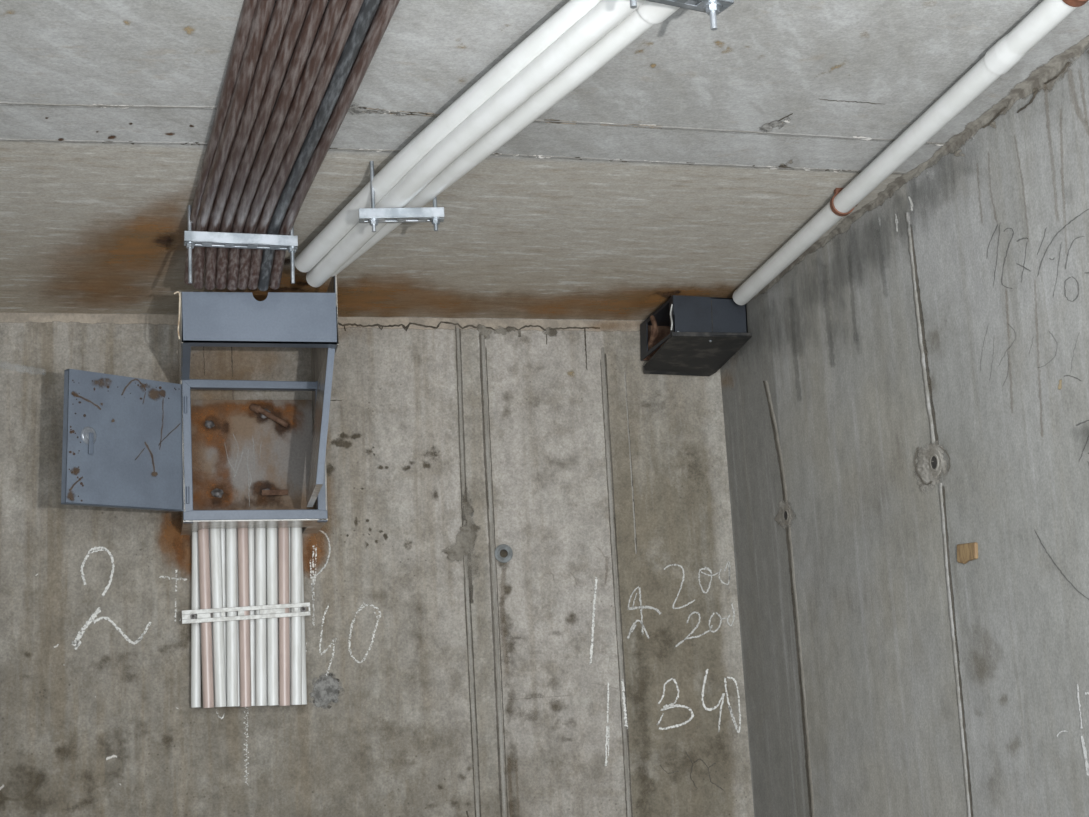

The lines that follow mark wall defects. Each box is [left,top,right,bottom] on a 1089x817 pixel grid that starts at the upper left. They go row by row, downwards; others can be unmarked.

corrosion [65,211,184,301]
corrosion [243,258,734,318]
crack [338,321,600,369]
corrosion [160,514,192,573]